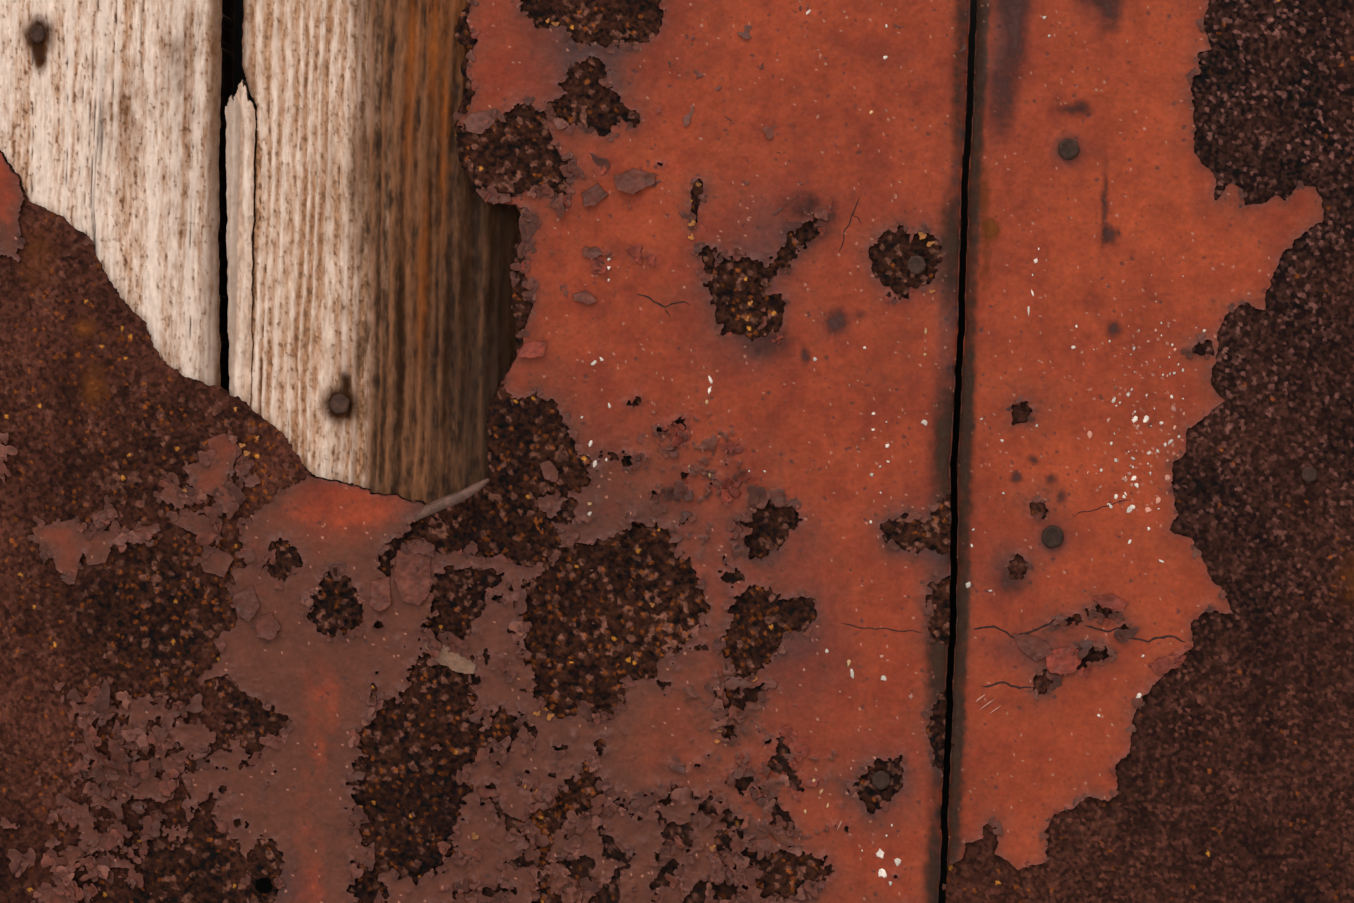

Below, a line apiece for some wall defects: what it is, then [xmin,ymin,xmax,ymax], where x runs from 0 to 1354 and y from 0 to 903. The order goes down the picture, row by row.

corrosion [430,0,666,356]
corrosion [678,178,829,344]
corrosion [868,222,943,304]
corrosion [0,194,365,903]
peeling [153,435,276,566]
peeling [357,537,446,611]
peeling [417,627,477,674]
corrosion [345,373,817,903]
peeling [711,442,785,541]
peeling [1013,594,1137,681]
corrosion [880,0,1354,903]
peeling [447,676,823,903]